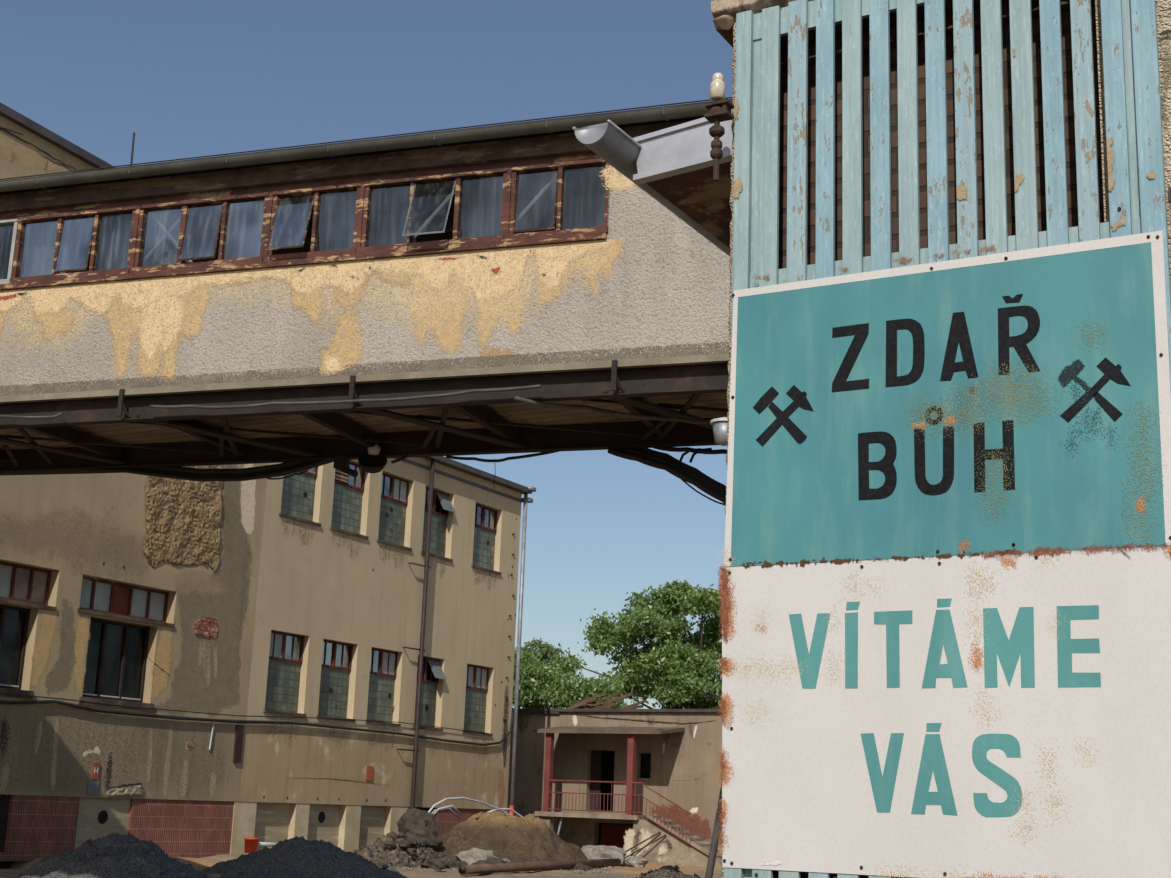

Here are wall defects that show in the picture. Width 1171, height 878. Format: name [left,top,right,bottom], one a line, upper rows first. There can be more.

crack [0,126,76,170]
peeling [956,185,967,200]
peeling [1014,173,1025,193]
peeling [1106,137,1115,193]
peeling [1110,215,1126,231]
peeling [0,238,626,382]
spalling [143,465,224,574]
spalling [193,616,220,686]